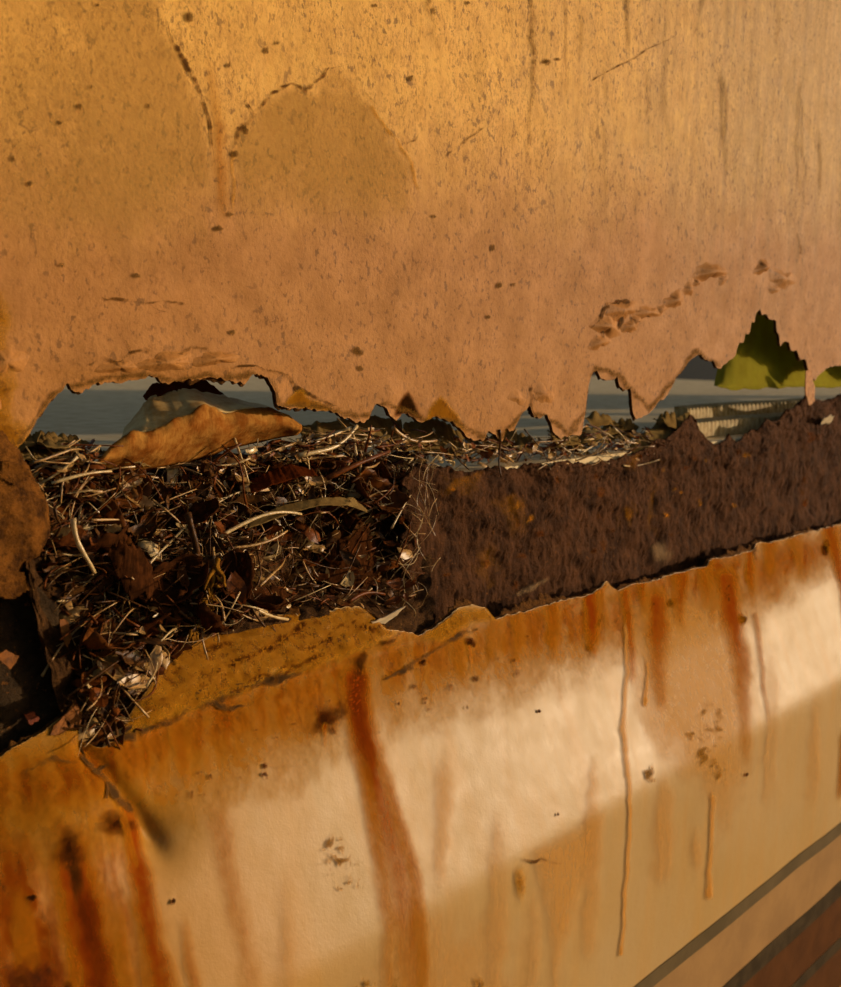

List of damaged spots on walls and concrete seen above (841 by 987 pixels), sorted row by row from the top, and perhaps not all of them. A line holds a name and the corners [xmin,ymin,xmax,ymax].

crack [168,28,329,145]
peeling [804,370,815,405]
peeling [396,392,464,431]
peeling [0,567,30,599]
peeling [426,608,497,660]
peeling [0,649,19,669]
peeling [126,606,406,727]
peeling [24,711,40,725]
spalling [316,706,347,736]
corrosion [0,523,841,987]